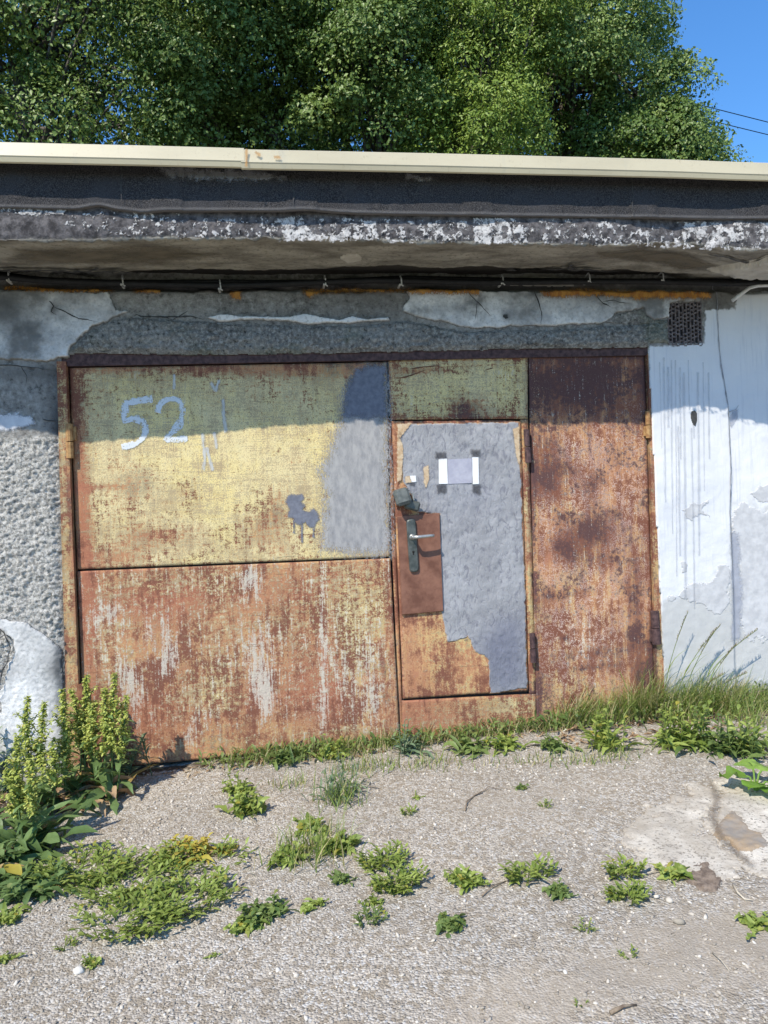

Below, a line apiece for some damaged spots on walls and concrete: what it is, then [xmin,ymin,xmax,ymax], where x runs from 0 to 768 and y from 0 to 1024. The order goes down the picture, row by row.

flaking render [0,272,130,363]
flaking render [207,314,390,325]
corrosion [303,288,482,298]
flaking render [402,273,701,329]
corrosion [541,288,712,300]
peeling [667,484,768,643]
flaking render [0,618,66,767]